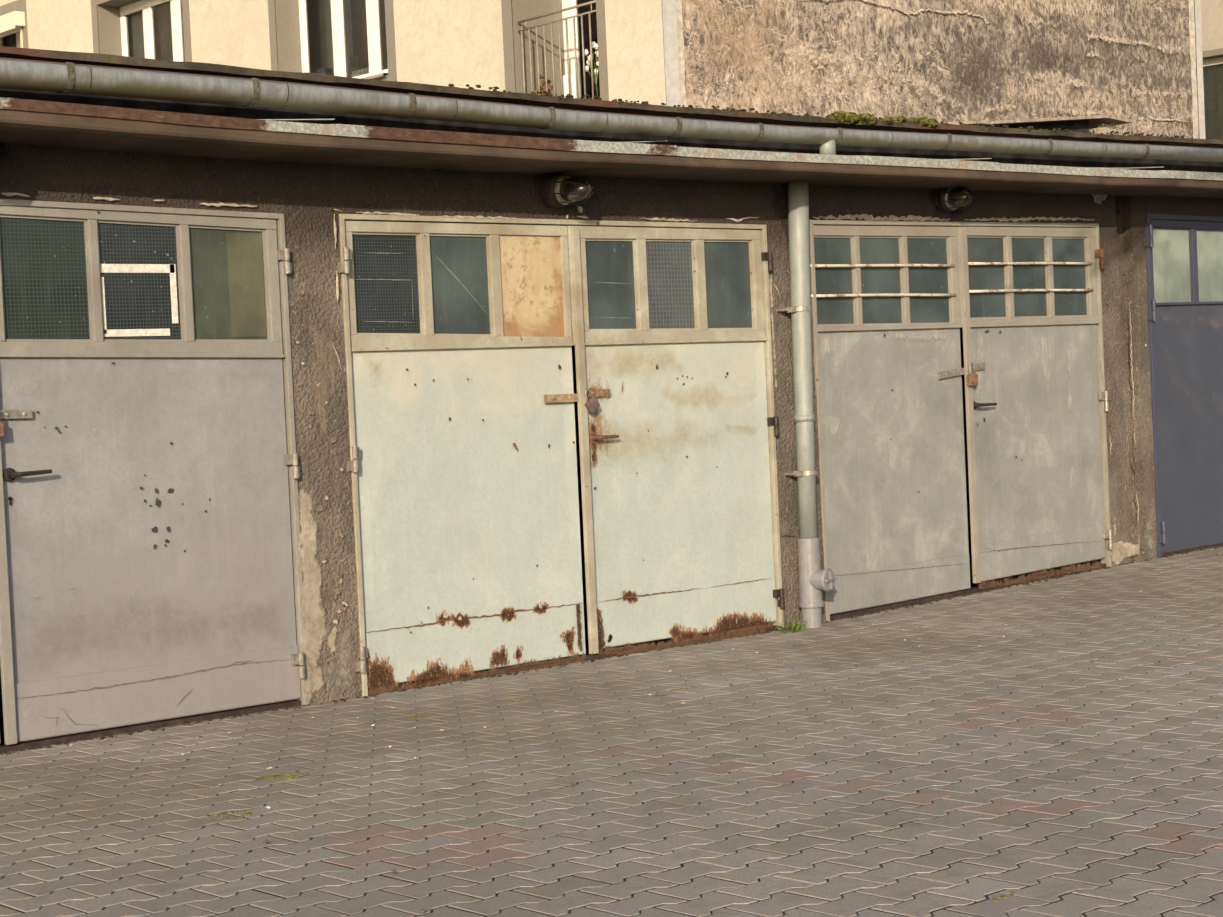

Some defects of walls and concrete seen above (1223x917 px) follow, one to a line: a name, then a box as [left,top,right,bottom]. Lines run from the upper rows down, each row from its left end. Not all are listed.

corrosion [588,384,612,466]
peeling [297,490,347,701]
corrosion [622,590,638,604]
corrosion [366,604,775,695]